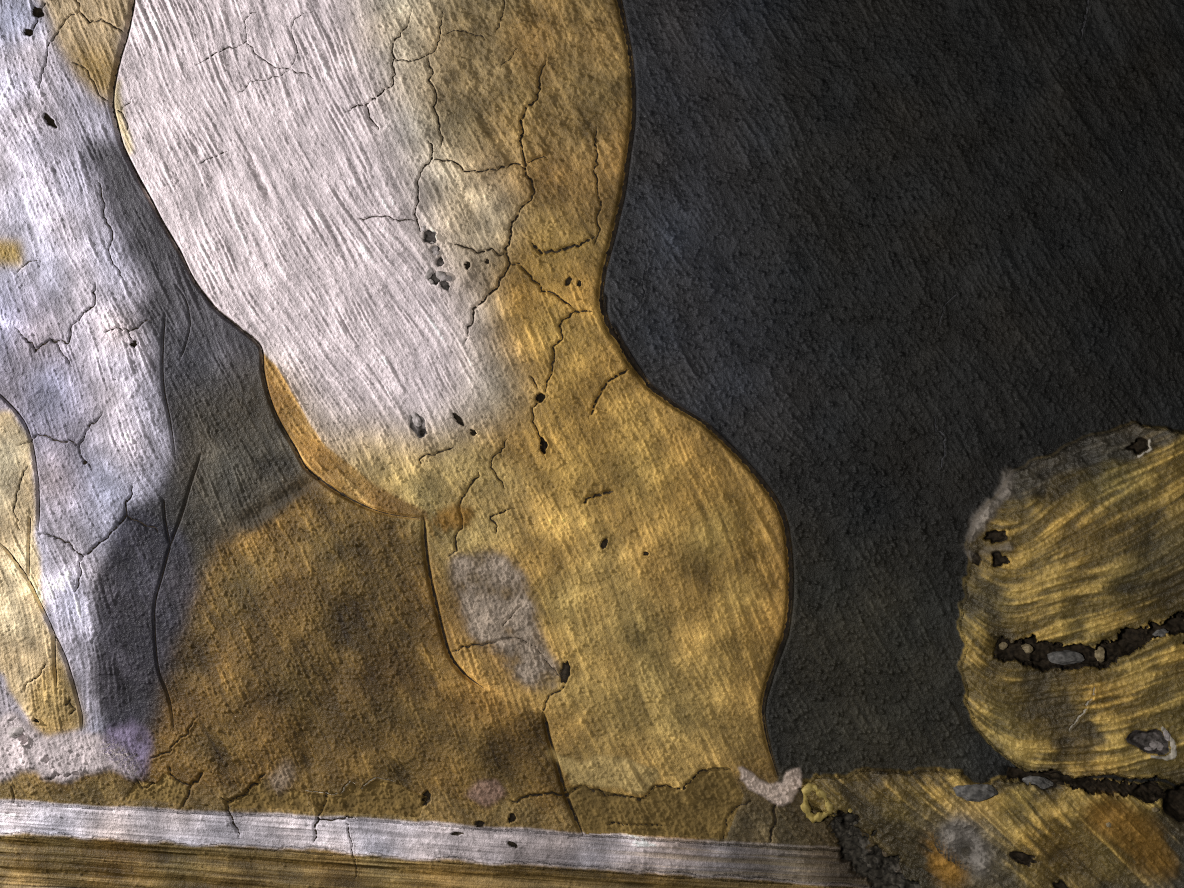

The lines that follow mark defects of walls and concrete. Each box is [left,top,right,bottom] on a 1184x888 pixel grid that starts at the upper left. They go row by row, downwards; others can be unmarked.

crack [349,0,602,460]
crack [17,180,151,365]
crack [588,369,628,417]
crack [419,448,452,464]
spalling [1126,437,1152,458]
crack [13,414,158,592]
crack [449,438,511,556]
spalling [972,530,1010,567]
spalling [1126,726,1177,761]
spalling [1132,783,1184,823]
crack [313,793,358,879]
spalling [1009,851,1037,867]